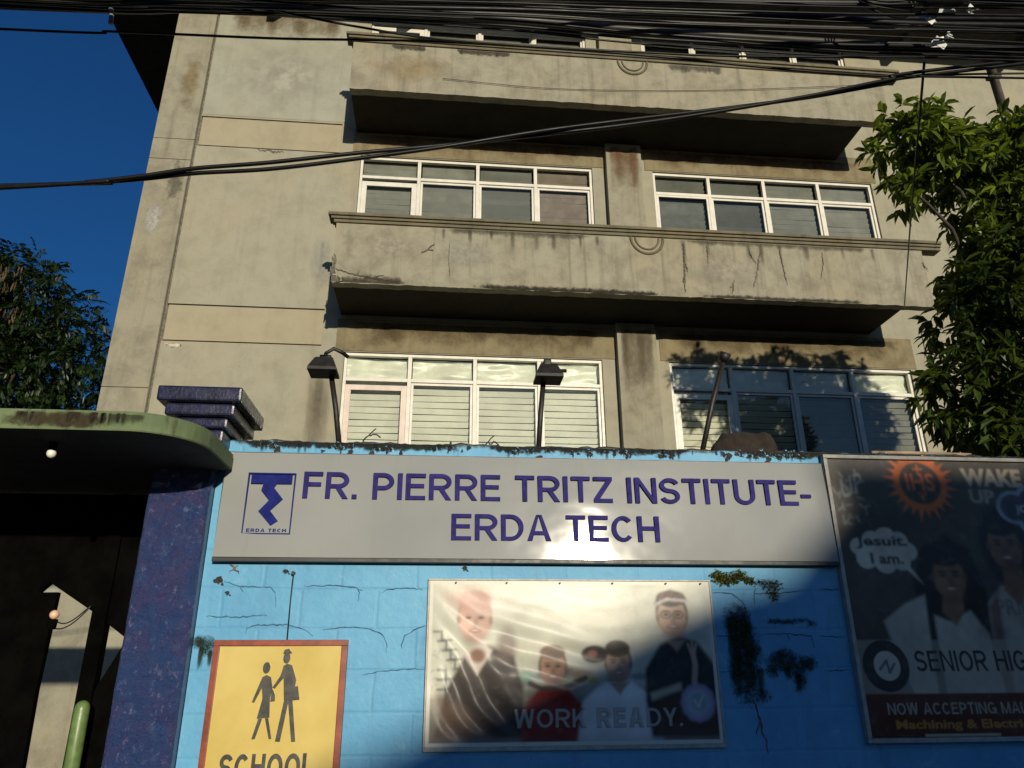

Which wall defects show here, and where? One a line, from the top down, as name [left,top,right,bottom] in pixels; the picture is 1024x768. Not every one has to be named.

water stain [482,285,656,294]
crack [683,245,709,292]
crack [731,250,788,294]
water stain [9,411,143,428]
crack [209,564,426,675]